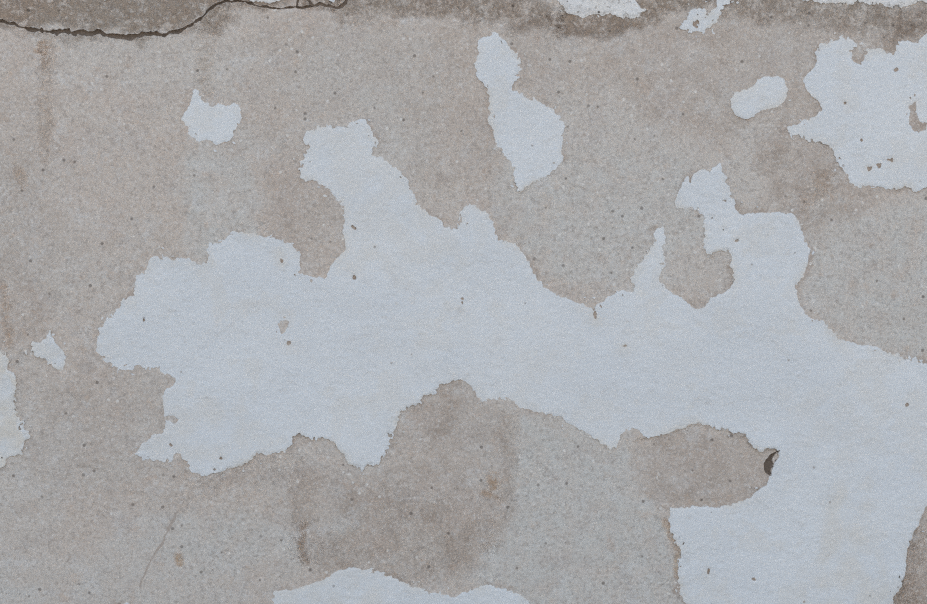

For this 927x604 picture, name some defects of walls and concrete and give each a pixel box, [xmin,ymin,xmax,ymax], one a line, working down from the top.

peeling [0,0,223,35]
crack [0,0,348,41]
peeling [266,0,297,9]
peeling [679,0,730,34]
peeling [181,89,242,145]
peeling [474,32,565,192]
peeling [730,76,788,119]
peeling [787,33,927,192]
peeling [0,352,31,468]
peeling [634,422,779,508]
peeling [893,506,927,604]